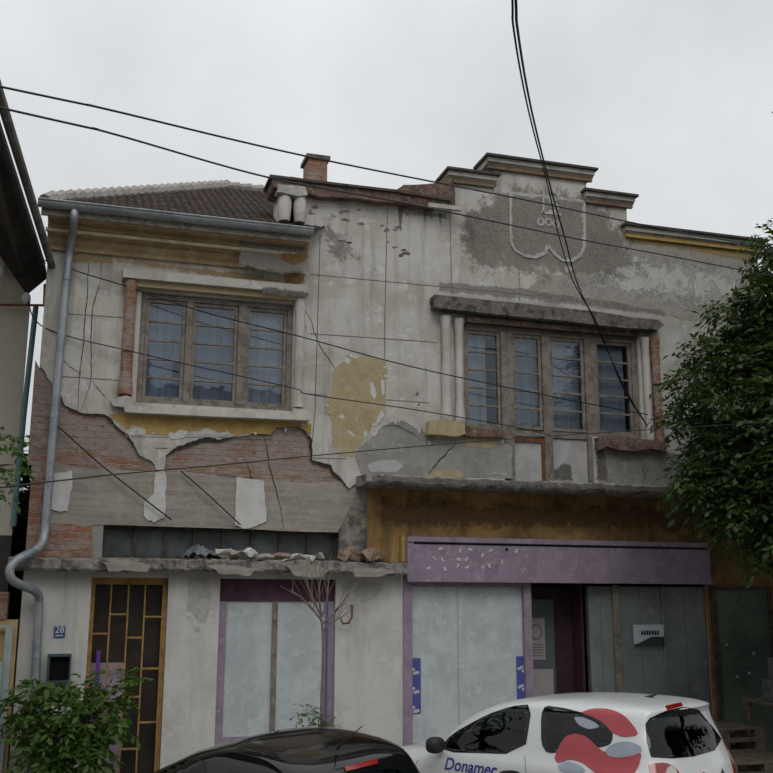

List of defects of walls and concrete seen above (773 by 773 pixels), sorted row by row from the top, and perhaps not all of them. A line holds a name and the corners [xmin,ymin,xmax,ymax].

leakage [439,186,665,316]
crack [63,255,106,409]
peeling [325,354,404,457]
flaking render [26,360,395,610]
leakage [380,498,713,534]